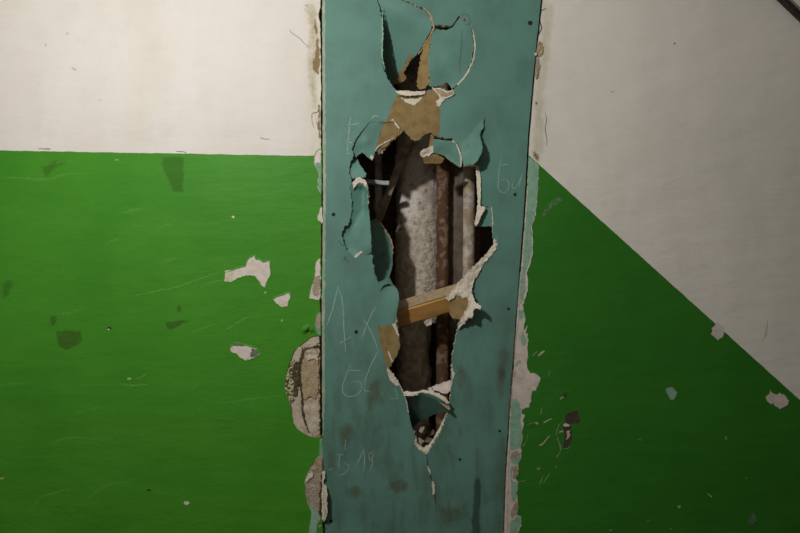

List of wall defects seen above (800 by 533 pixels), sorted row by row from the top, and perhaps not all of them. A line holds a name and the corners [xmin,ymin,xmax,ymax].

spalling [420,119,500,329]
peeling [223,254,292,308]
spalling [342,119,455,455]
peeling [229,342,261,362]
peeling [503,158,541,533]
peeling [711,321,724,340]
flaking render [285,311,328,533]
peeling [556,408,581,458]
peeling [765,389,790,410]